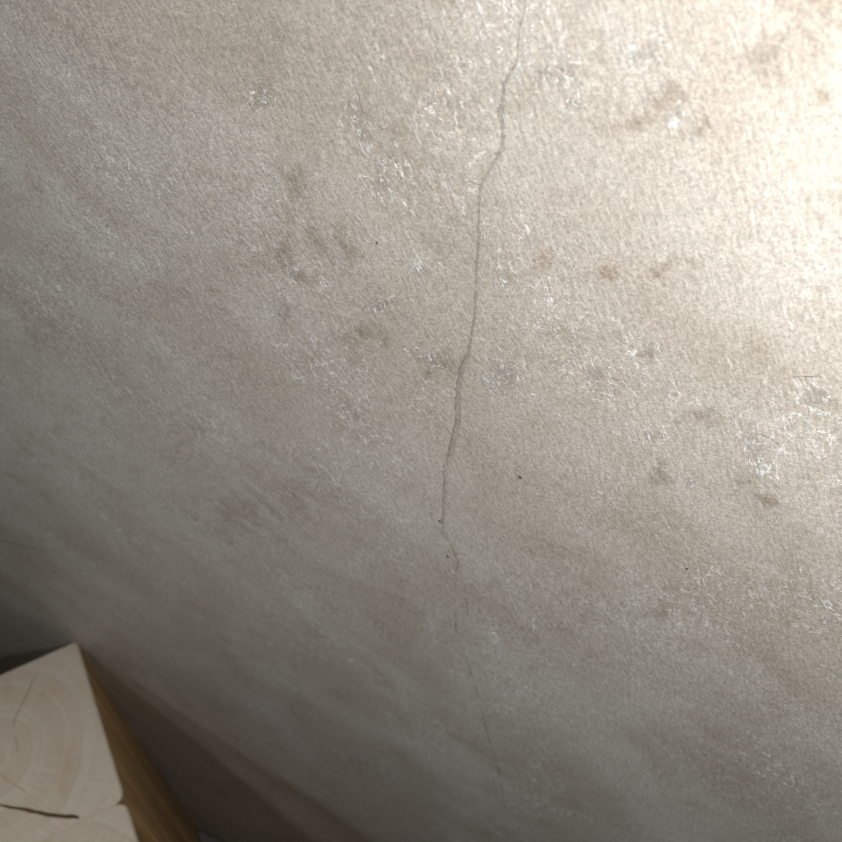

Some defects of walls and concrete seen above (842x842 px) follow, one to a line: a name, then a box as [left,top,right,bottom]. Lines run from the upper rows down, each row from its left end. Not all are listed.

crack [441,0,527,831]